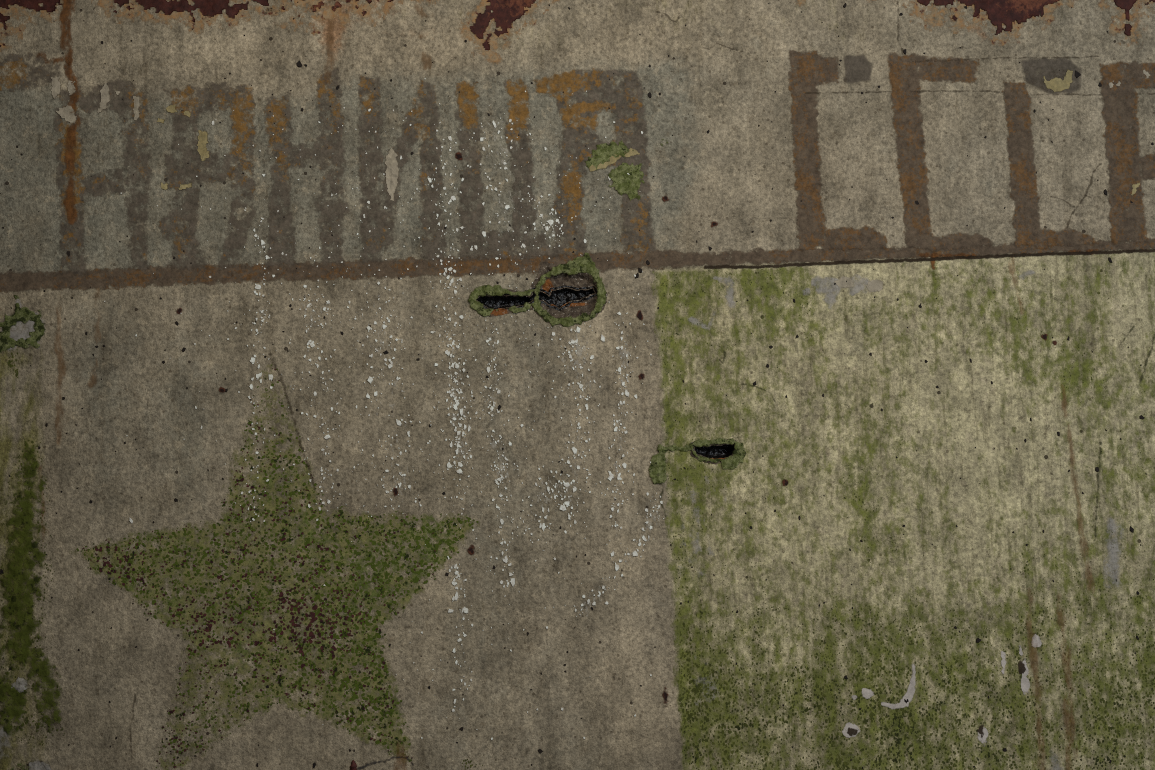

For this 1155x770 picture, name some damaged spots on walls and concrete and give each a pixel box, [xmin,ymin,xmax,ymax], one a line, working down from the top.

peeling [884,0,1074,48]
peeling [1099,0,1155,47]
rust [37,0,80,224]
leakage [427,119,564,265]
leakage [241,218,275,522]
leakage [292,279,340,521]
leakage [362,300,420,503]
spalling [461,238,608,357]
leakage [435,249,637,588]
spalling [648,421,764,484]
leakage [574,493,664,617]